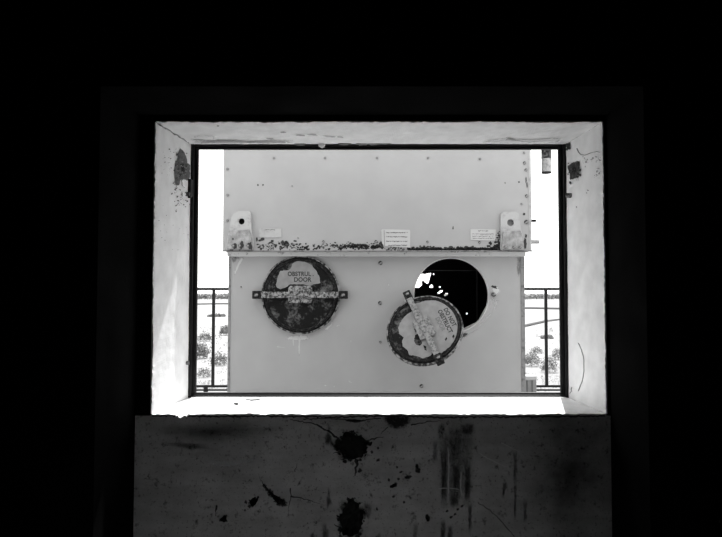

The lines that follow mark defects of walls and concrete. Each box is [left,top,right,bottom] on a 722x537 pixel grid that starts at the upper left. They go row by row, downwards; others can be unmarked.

peeling [164,149,191,212]
damp [381,416,472,537]